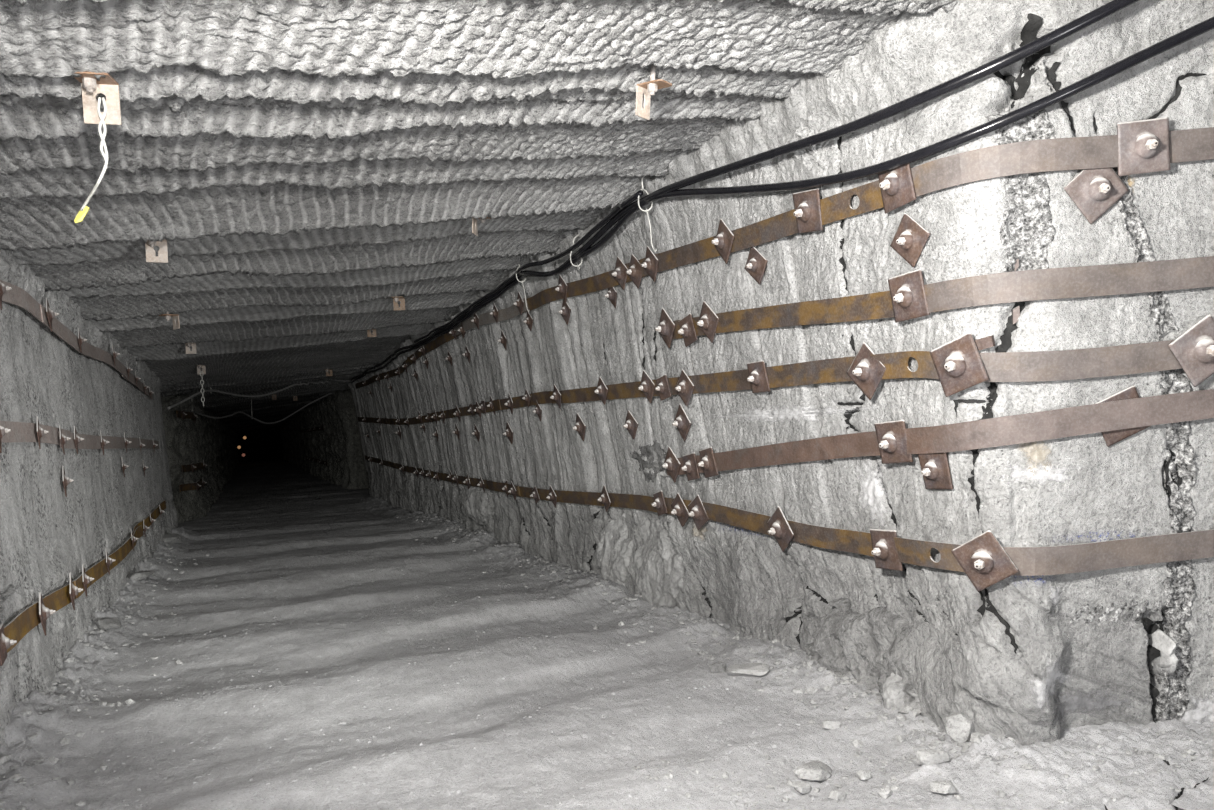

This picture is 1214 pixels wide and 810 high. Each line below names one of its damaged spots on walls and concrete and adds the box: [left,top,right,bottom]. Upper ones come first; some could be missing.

crack [1147,73,1207,120]
crack [837,136,848,291]
crack [848,333,856,356]
crack [995,301,1025,353]
crack [837,387,865,432]
crack [953,382,998,420]
crack [968,449,983,534]
crack [1164,450,1182,497]
crack [1144,611,1165,723]
crack [1163,760,1209,810]